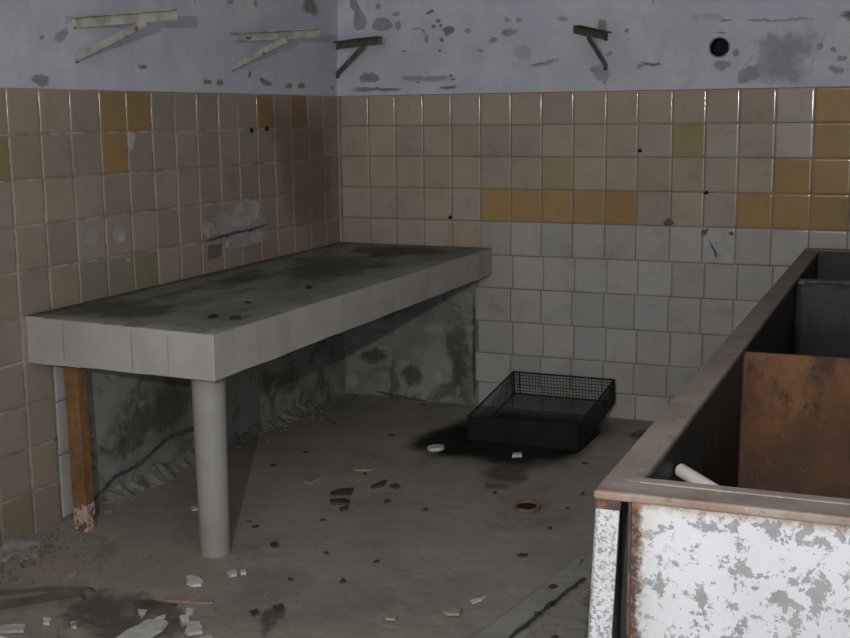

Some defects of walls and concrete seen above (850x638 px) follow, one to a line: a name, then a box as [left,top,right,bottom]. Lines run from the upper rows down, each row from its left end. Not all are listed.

peeling [350,0,401,31]
peeling [411,9,454,52]
spalling [203,199,269,261]